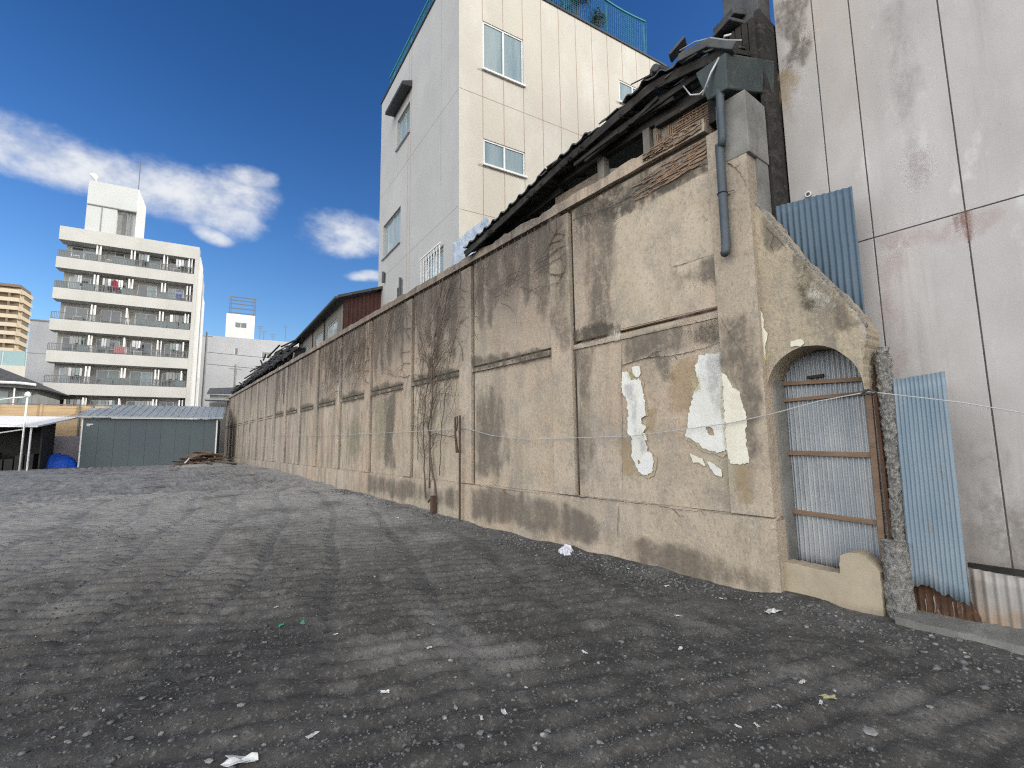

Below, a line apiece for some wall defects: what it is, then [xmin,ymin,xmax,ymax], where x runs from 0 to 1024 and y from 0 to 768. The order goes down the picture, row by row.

leakage [471,164,704,409]
peeling [620,366,658,479]
peeling [684,352,750,477]
leakage [472,488,598,543]
rust [913,585,982,623]